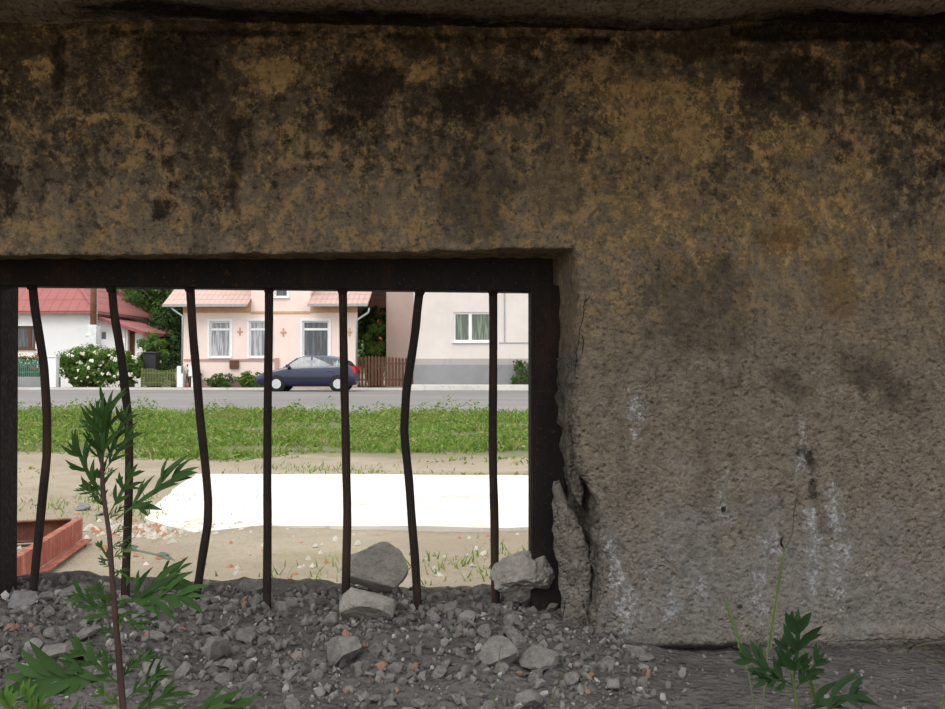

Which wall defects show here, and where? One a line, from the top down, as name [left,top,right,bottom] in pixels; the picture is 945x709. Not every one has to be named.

leakage [52,35,68,97]
leakage [131,30,219,141]
leakage [326,52,405,148]
crack [83,0,679,43]
leakage [388,7,945,130]
crack [730,11,945,44]
leakage [0,152,24,223]
leakage [152,152,180,221]
leakage [227,118,249,202]
leakage [793,415,854,617]